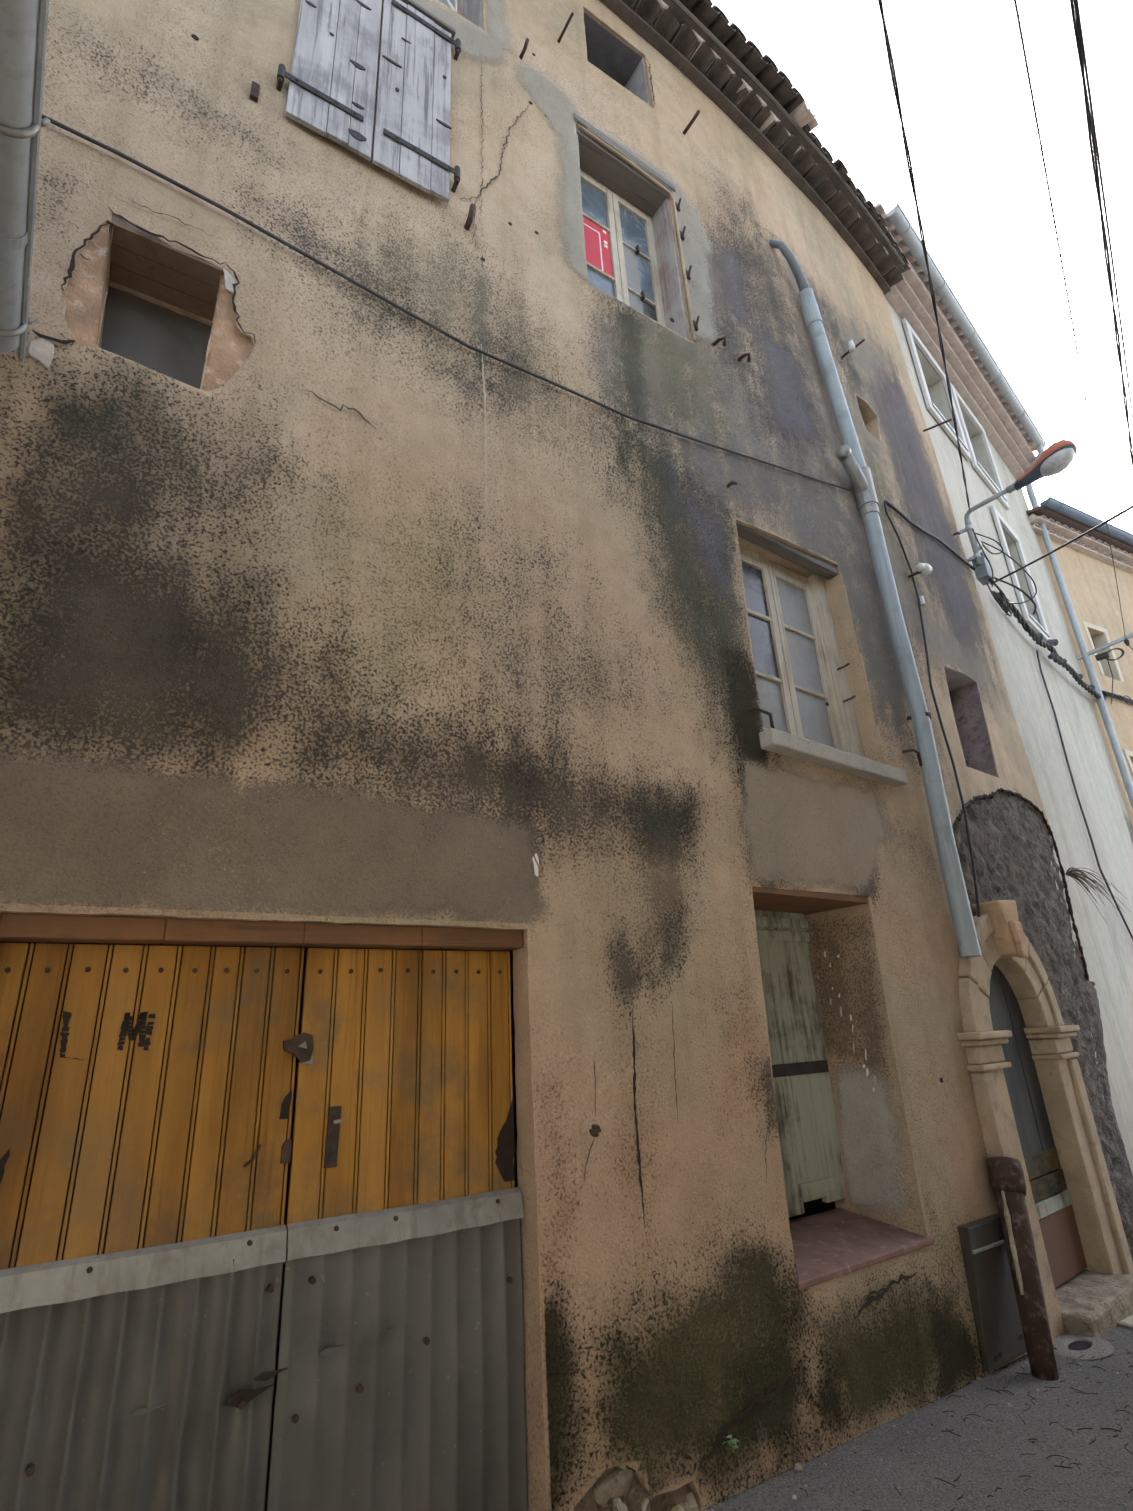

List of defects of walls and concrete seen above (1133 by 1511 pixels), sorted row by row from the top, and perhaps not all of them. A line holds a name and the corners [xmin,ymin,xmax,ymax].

crack [460,49,528,246]
peeling [29,338,54,370]
spalling [61,223,110,348]
spalling [202,268,254,391]
leakage [0,25,1007,1027]
leakage [808,776,936,1220]
leakage [754,1057,779,1141]
spalling [574,1463,699,1511]